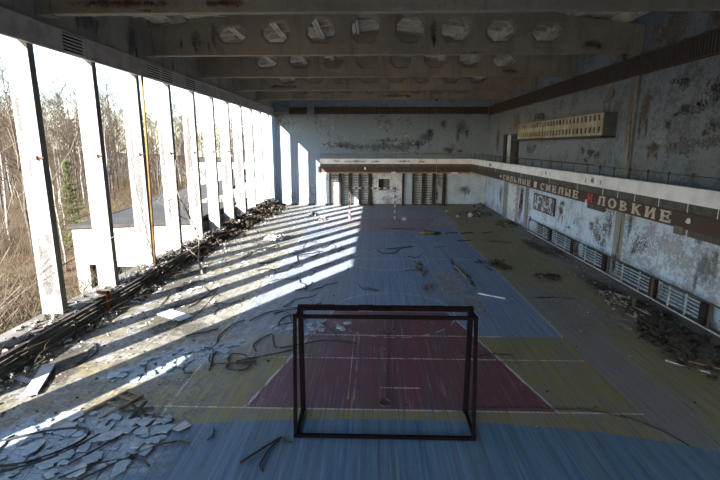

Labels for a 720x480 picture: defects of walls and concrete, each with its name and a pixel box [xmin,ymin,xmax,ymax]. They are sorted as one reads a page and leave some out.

spalling [589,209,614,250]